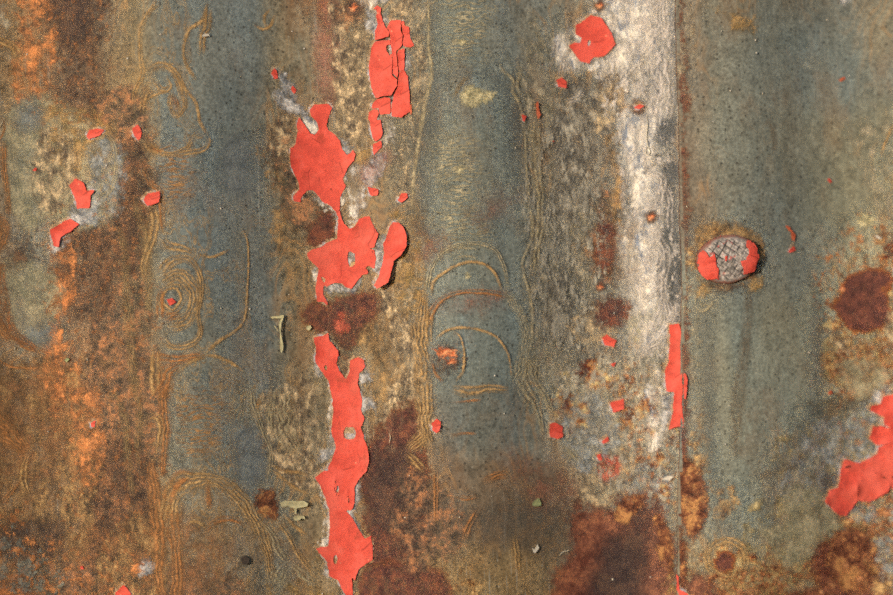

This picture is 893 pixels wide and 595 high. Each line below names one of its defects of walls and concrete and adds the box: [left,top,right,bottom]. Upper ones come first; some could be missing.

peeling [569,0,616,64]
rust [0,0,179,595]
peeling [288,102,408,305]
rust [516,0,893,595]
peeling [697,250,728,280]
peeling [741,240,759,274]
peeling [663,322,688,430]
rust [253,489,278,520]
peeling [313,332,374,595]
peeling [822,393,893,517]